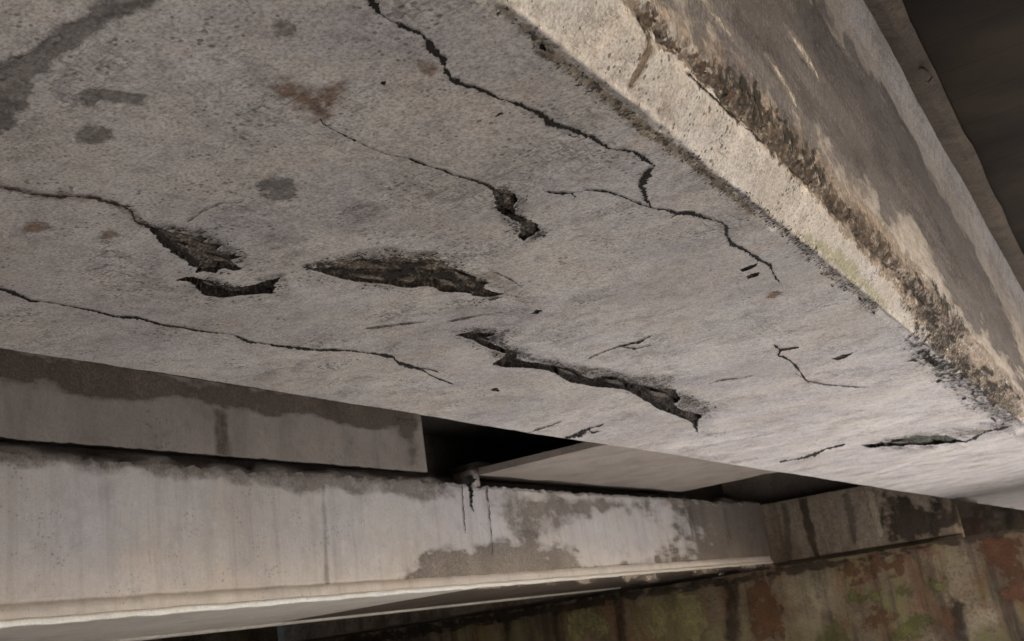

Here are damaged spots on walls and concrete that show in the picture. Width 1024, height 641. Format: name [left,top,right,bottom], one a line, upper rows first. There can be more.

crack [368,0,780,283]
damp [660,0,1024,390]
spalling [134,217,290,303]
spalling [302,247,512,306]
damp [0,348,447,500]
crack [0,288,487,384]
spalling [452,325,719,437]
crack [780,444,846,463]
crack [774,345,866,388]
damp [406,493,649,589]
damp [621,498,820,581]
damp [864,490,1006,542]